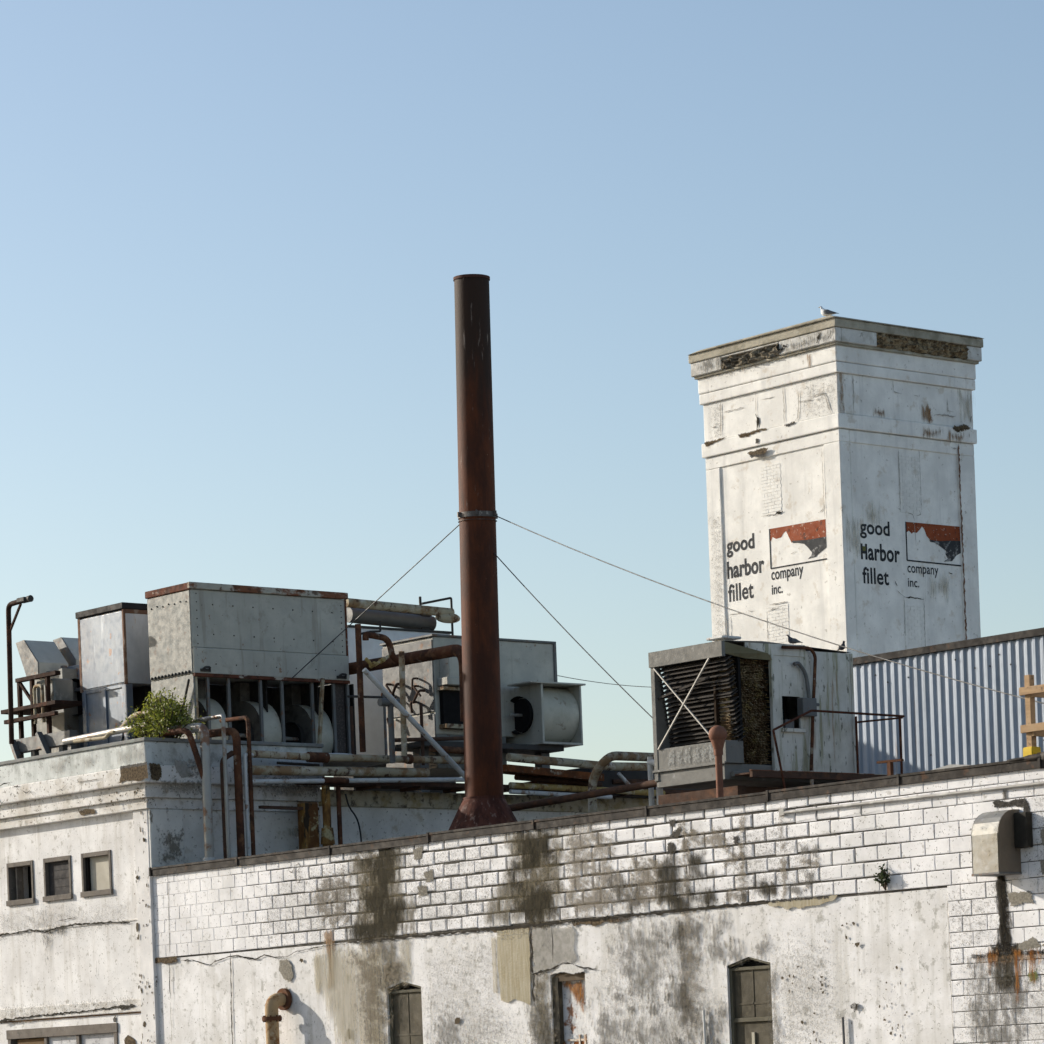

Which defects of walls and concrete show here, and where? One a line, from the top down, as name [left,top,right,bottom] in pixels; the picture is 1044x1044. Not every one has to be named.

spalling [720,344,780,370]
spalling [876,333,969,359]
spalling [923,424,970,440]
crack [0,917,130,936]
leakage [487,814,819,1044]
leakage [314,847,415,1044]
corrosion [971,949,1044,1000]
leakage [967,956,1038,1044]
peeling [124,1014,155,1044]